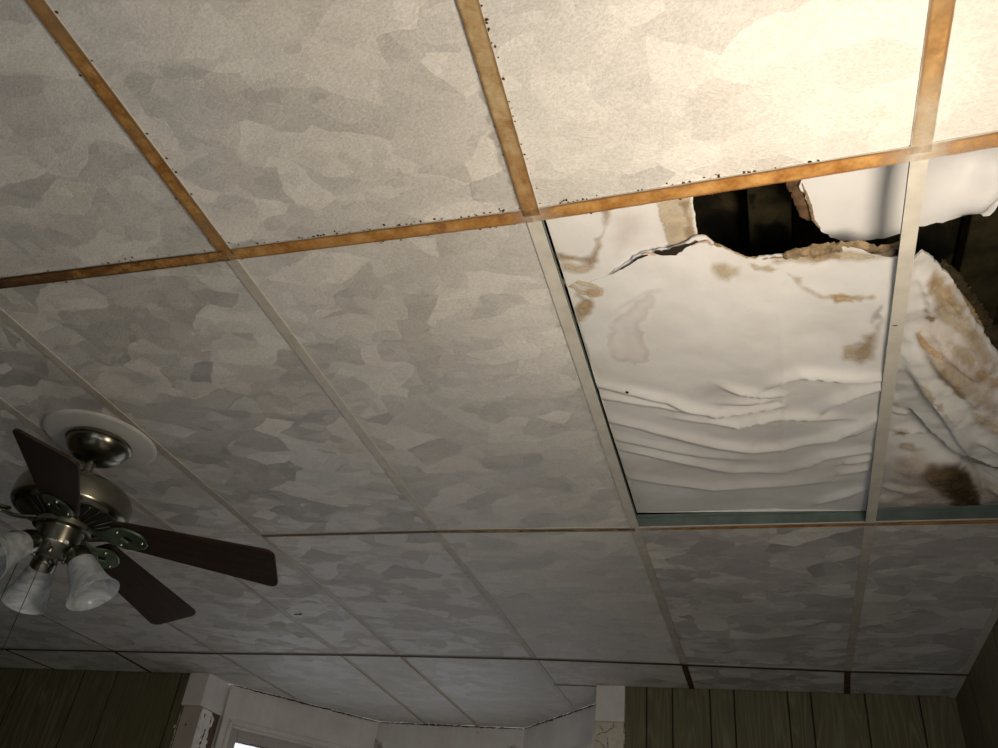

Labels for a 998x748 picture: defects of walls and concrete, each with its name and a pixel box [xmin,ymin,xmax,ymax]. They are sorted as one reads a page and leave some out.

corrosion [0,0,956,289]
corrosion [950,132,998,155]
water stain [560,247,603,321]
water stain [715,265,736,278]
water stain [793,252,875,262]
water stain [845,336,873,360]
water stain [918,276,998,408]
water stain [898,432,995,506]
peeling [191,708,214,748]